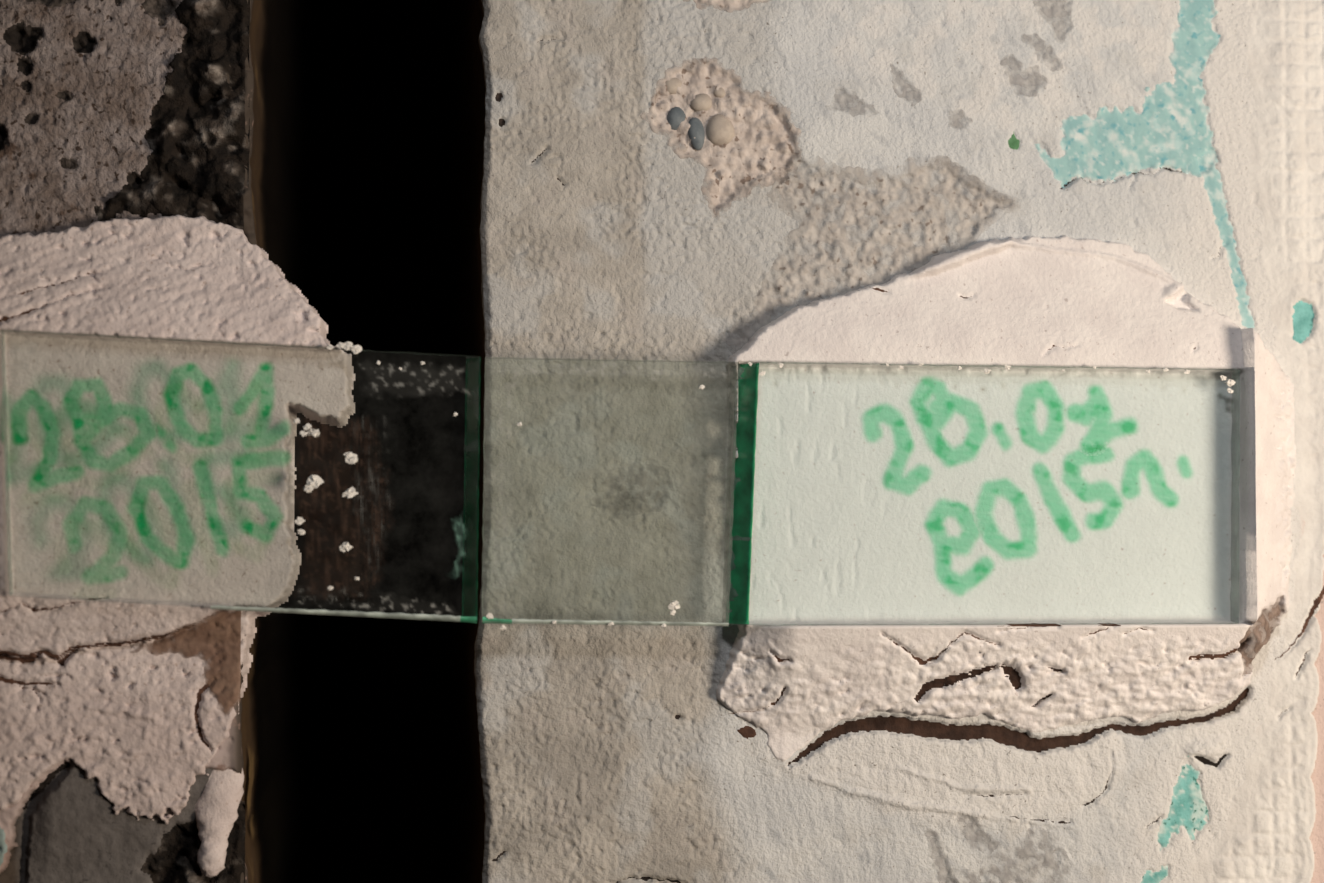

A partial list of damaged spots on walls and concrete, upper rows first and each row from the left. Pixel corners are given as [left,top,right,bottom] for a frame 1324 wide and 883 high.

spalling [0,0,250,238]
spalling [641,57,1014,351]
peeling [1008,0,1255,328]
crack [1,598,102,612]
crack [0,623,198,694]
crack [731,654,789,714]
crack [890,623,1147,707]
crack [1189,648,1238,660]
crack [1194,754,1227,767]
spalling [0,760,246,883]
peeling [1141,755,1209,883]